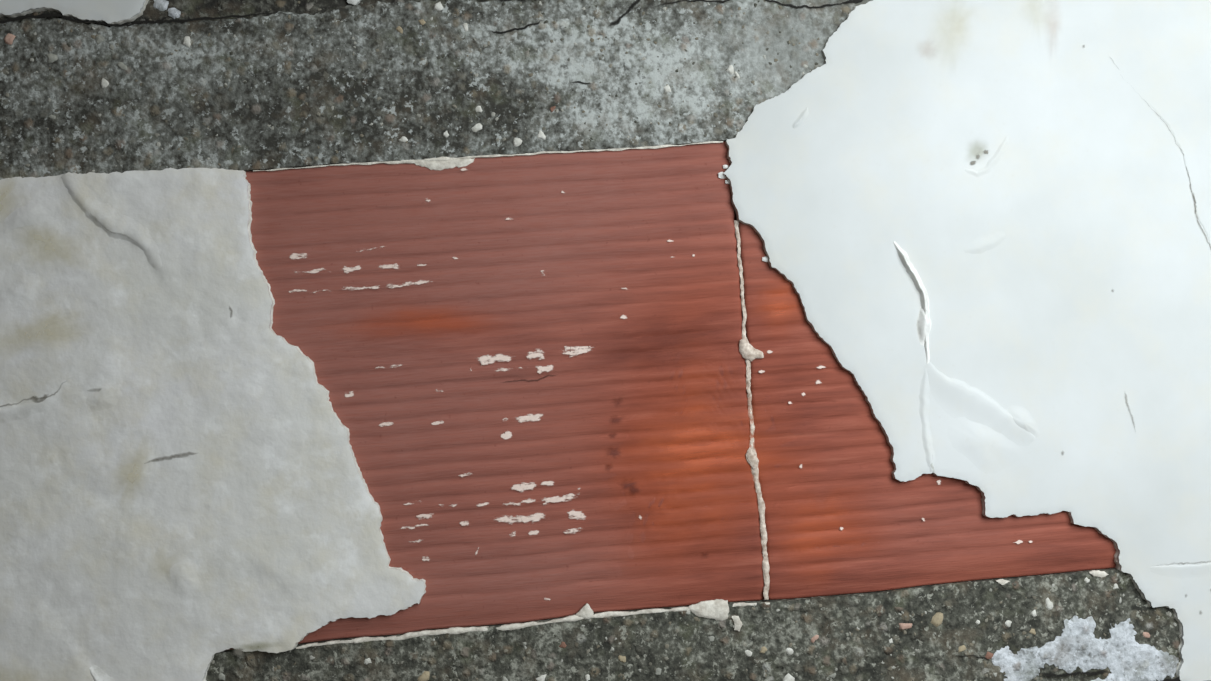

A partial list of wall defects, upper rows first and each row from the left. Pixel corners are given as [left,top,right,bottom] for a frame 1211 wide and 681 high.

spalling [0,0,181,24]
crack [492,0,542,34]
crack [610,0,729,25]
crack [765,0,863,9]
crack [1150,101,1211,247]
spalling [718,125,904,482]
crack [0,390,63,423]
spalling [244,171,426,612]
spalling [1067,511,1151,607]
spalling [1166,606,1182,678]